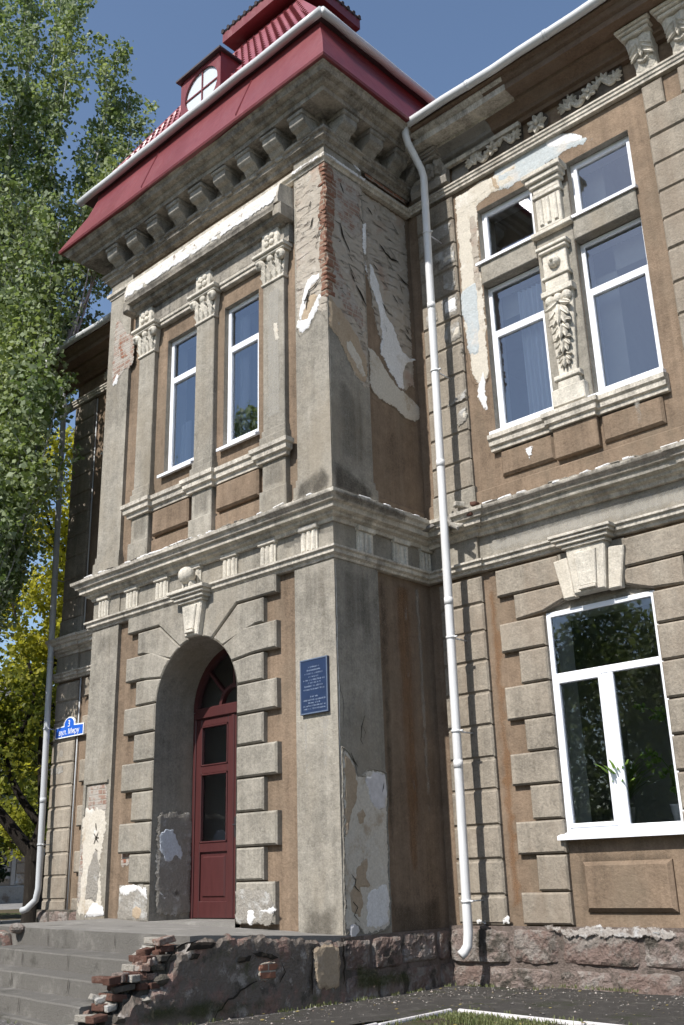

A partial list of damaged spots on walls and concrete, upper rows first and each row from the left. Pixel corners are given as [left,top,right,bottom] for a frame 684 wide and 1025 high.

peeling [124,185,279,297]
spalling [291,133,592,427]
flaking render [112,319,135,386]
peeling [77,779,109,917]
peeling [117,811,192,921]
peeling [235,888,277,927]
peeling [341,746,391,937]
spalling [70,935,216,1025]